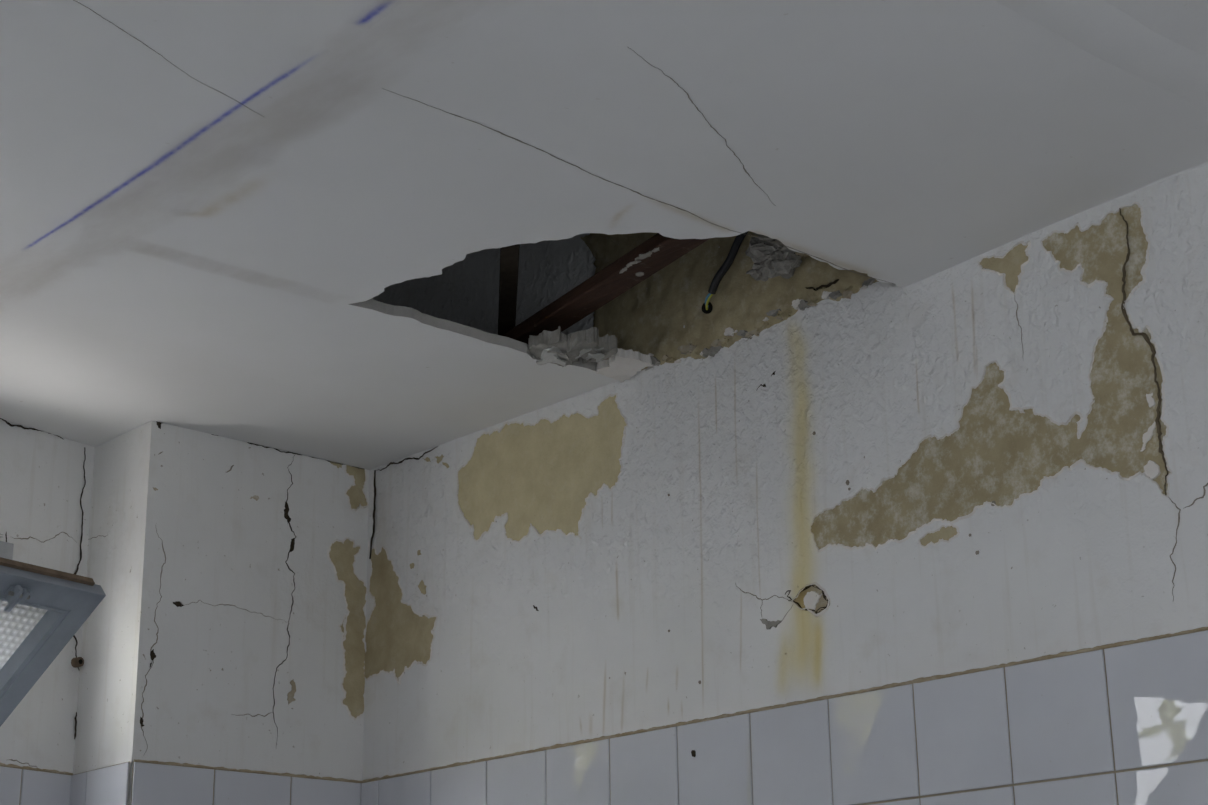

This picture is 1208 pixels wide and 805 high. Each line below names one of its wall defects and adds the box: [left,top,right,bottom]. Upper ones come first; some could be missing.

peeling [423,393,628,543]
spalling [581,232,657,275]
crack [382,88,894,284]
crack [628,47,776,206]
spalling [593,231,879,370]
peeling [810,202,1172,553]
crack [1119,208,1208,599]
crack [140,442,438,753]
peeling [327,537,437,720]